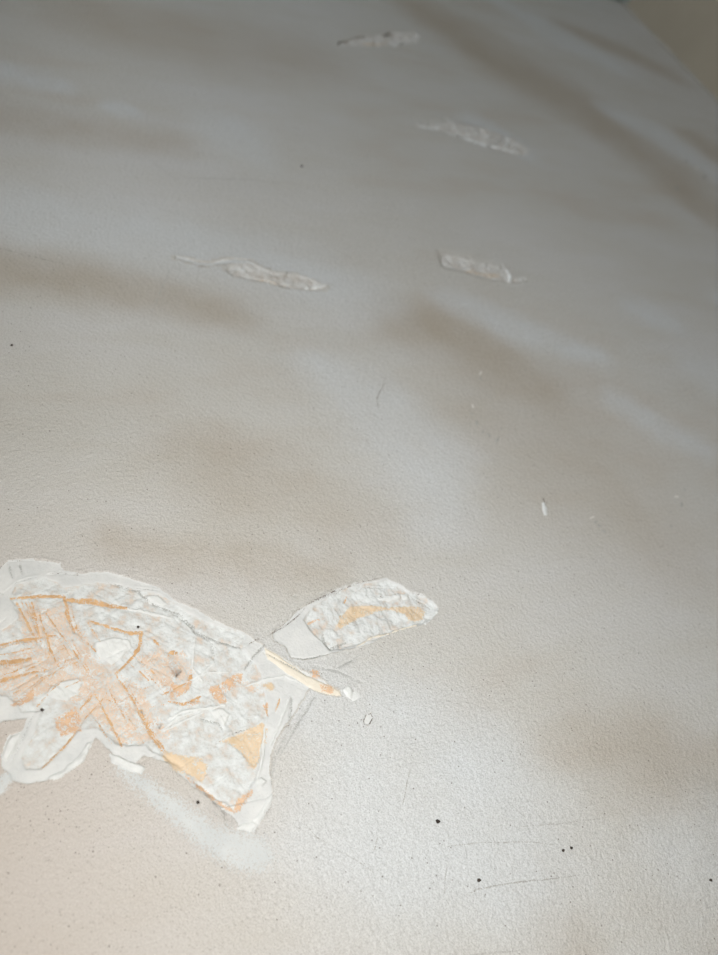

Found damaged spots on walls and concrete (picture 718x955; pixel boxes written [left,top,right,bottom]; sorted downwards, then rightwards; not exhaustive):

flaking render [414,122,530,156]
flaking render [0,558,438,879]